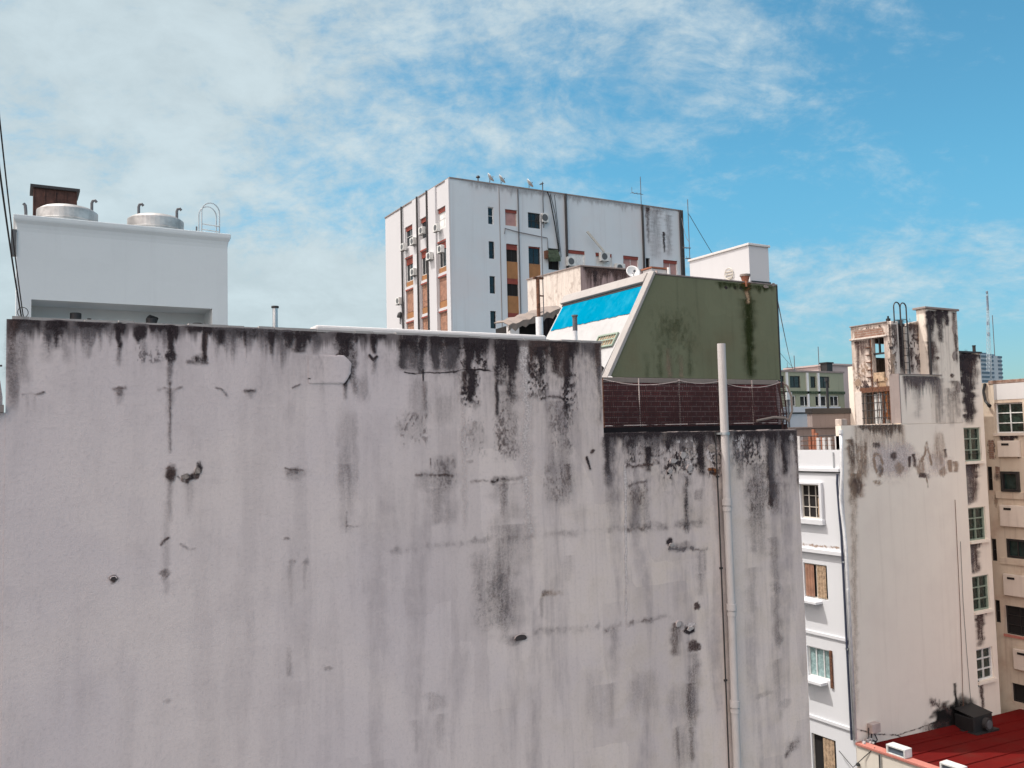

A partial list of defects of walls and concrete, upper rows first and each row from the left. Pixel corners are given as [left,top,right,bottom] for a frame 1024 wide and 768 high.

leakage [8,319,319,417]
leakage [334,332,386,388]
leakage [744,291,753,374]
leakage [853,339,871,377]
leakage [888,310,980,423]
leakage [399,335,601,537]
leakage [847,439,855,486]
peeling [850,442,945,496]
leakage [603,431,799,615]